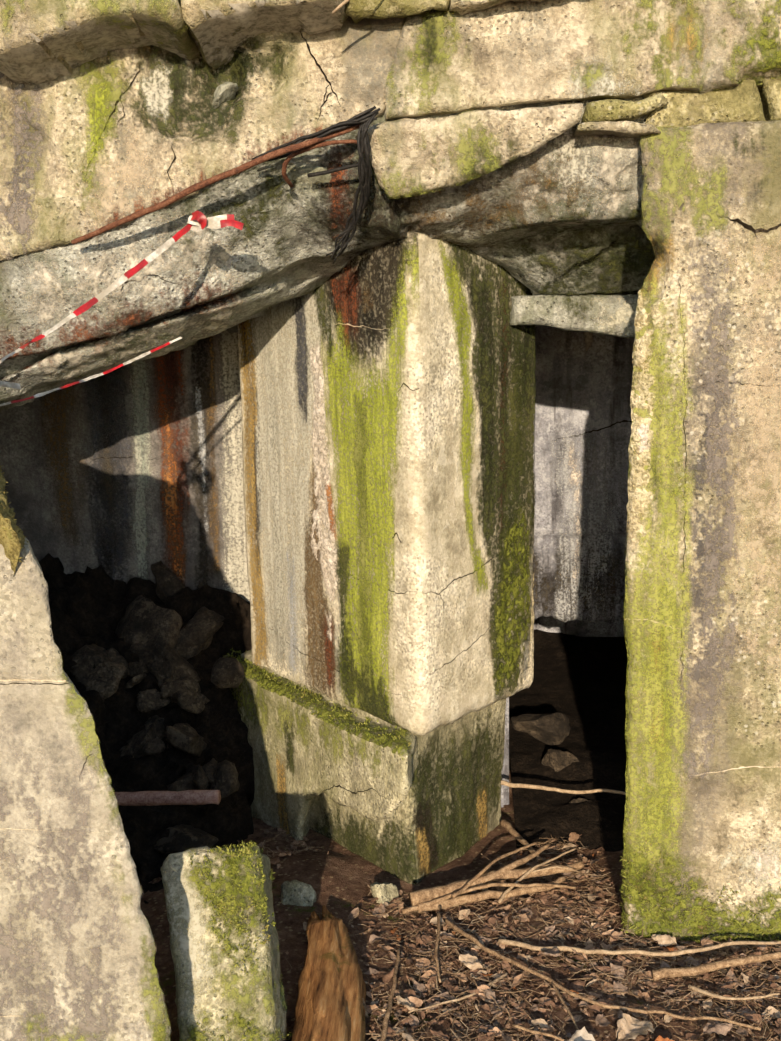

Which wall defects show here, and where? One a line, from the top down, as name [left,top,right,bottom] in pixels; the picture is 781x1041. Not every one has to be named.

crack [300,31,341,121]
crack [79,63,140,186]
crack [718,216,781,239]
rust [153,350,189,586]
water stain [30,125,645,727]
crack [552,420,632,441]
crack [389,556,496,611]
crack [323,785,392,801]